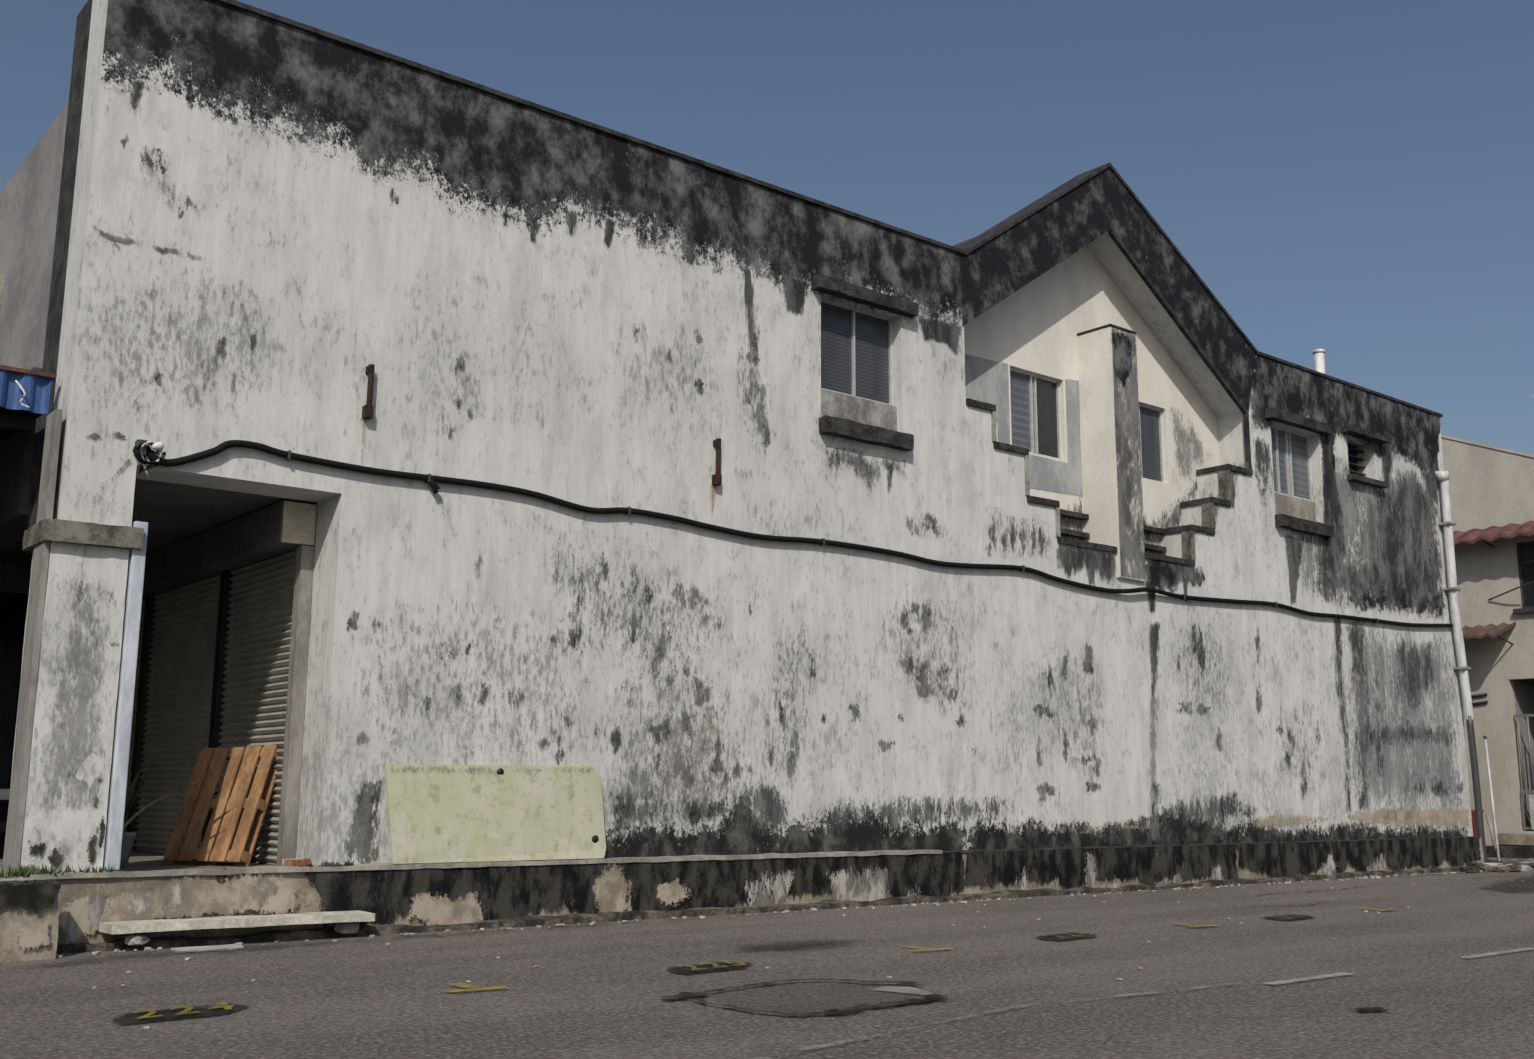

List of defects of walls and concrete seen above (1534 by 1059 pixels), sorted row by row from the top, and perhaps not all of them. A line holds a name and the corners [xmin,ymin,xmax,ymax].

damp [102,0,1481,928]
damp [28,840,63,869]
damp [87,816,105,863]